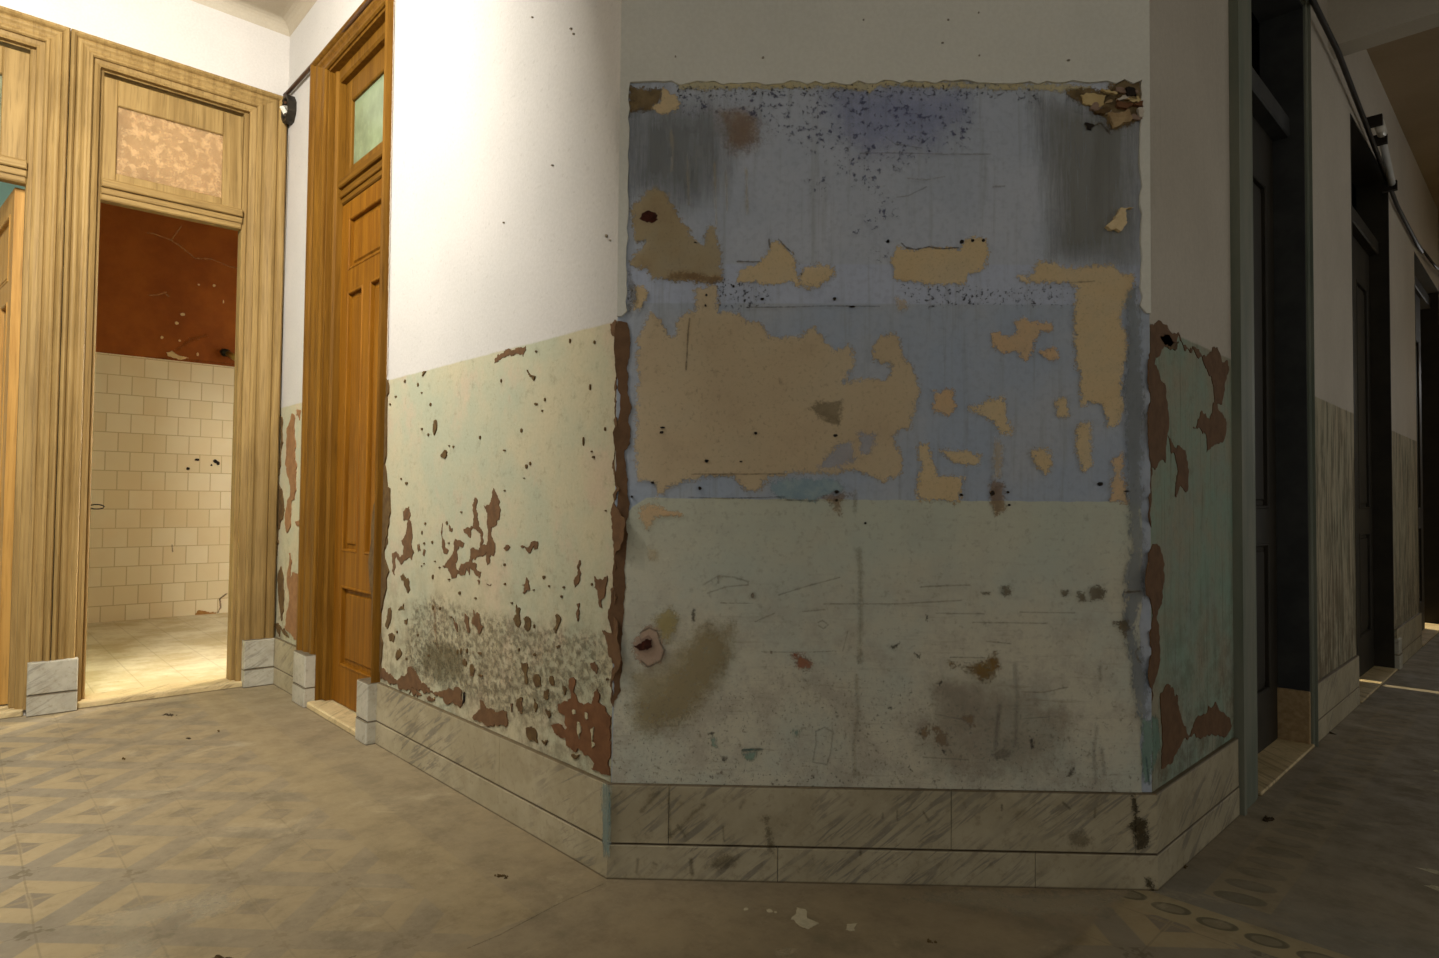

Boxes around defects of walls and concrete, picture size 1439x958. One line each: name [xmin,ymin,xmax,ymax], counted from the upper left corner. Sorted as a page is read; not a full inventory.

damp [634,82,1039,234]
flaking render [629,80,1144,134]
damp [1051,110,1132,253]
peeling [1105,207,1134,233]
peeling [275,409,301,640]
damp [407,605,606,715]
peeling [368,188,1014,776]
damp [622,607,983,781]
peeling [991,259,1136,475]
spalling [1060,584,1107,603]
peeling [1113,544,1232,769]
peeling [1147,320,1229,526]